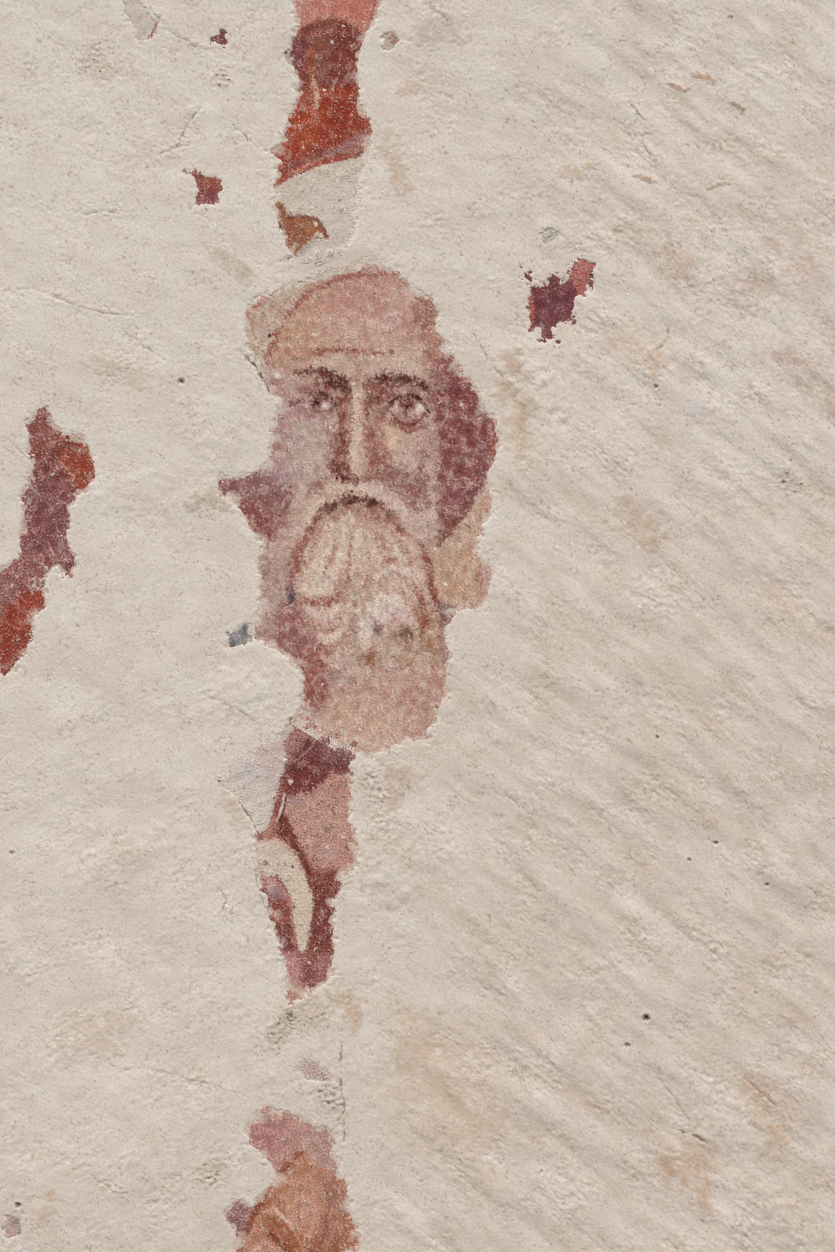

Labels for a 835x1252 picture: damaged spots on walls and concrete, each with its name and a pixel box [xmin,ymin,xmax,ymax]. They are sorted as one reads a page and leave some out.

peeling [191,0,502,1252]